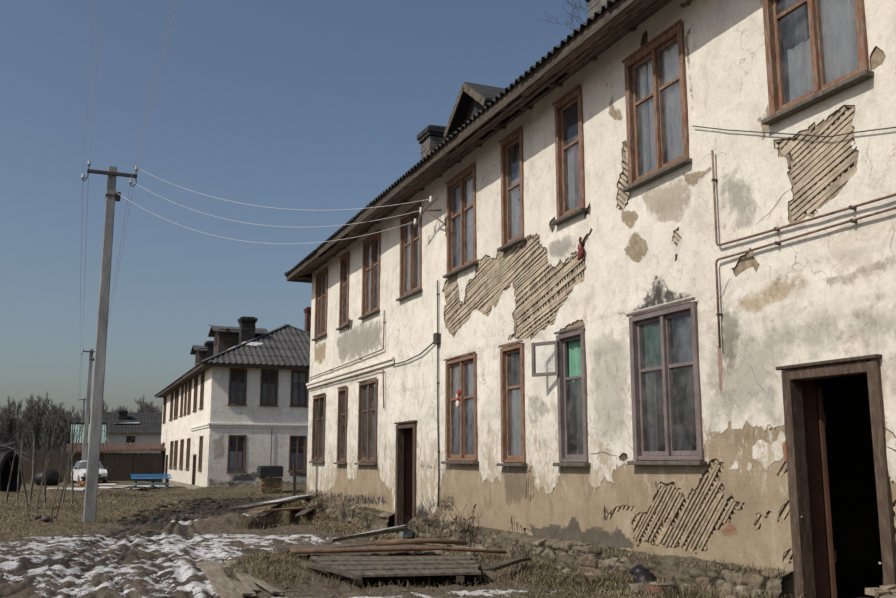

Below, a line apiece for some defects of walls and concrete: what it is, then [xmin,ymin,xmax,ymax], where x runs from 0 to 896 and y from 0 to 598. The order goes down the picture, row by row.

peeling [609,99,622,120]
flaking render [616,141,648,263]
peeling [683,167,711,185]
flaking render [758,105,859,223]
flaking render [871,47,886,70]
flaking render [443,229,593,340]
flaking render [730,251,760,276]
peeling [431,421,795,598]